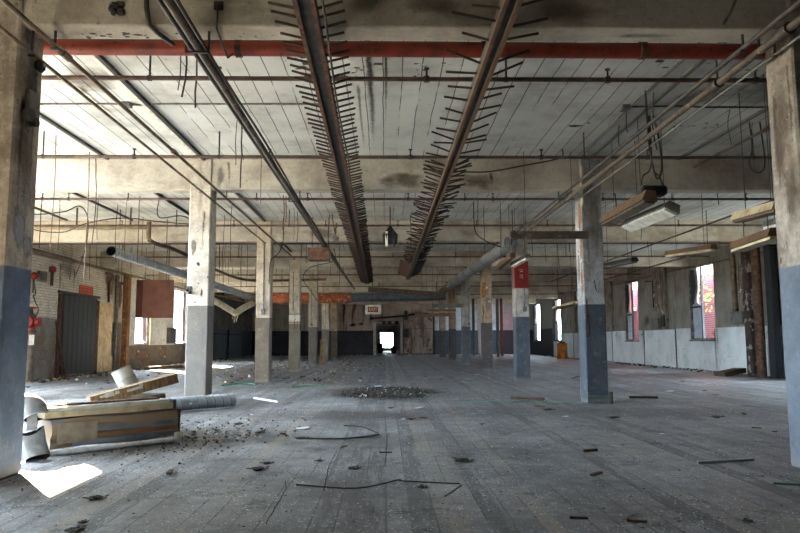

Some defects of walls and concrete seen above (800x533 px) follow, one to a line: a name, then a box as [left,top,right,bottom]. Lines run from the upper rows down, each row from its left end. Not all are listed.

leakage [357,57,374,128]
leakage [397,175,415,185]